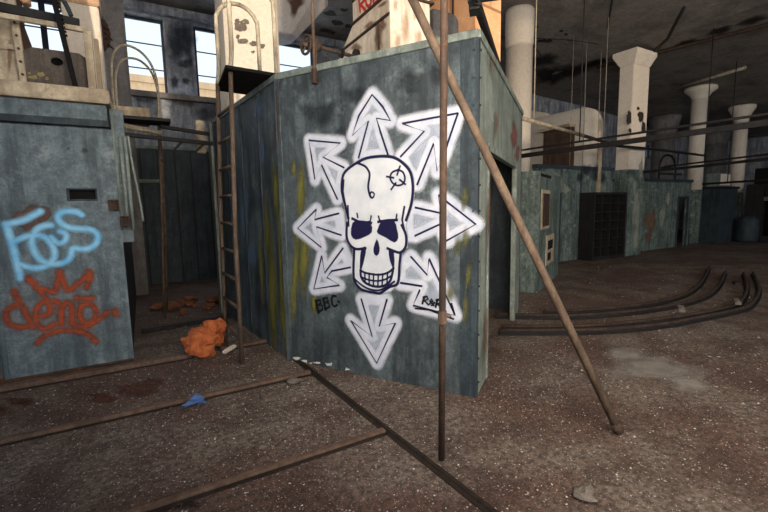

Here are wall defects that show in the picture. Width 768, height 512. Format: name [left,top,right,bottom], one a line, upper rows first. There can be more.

peeling [234,19,265,53]
peeling [626,107,646,133]
water stain [292,161,305,218]
water stain [259,171,316,346]